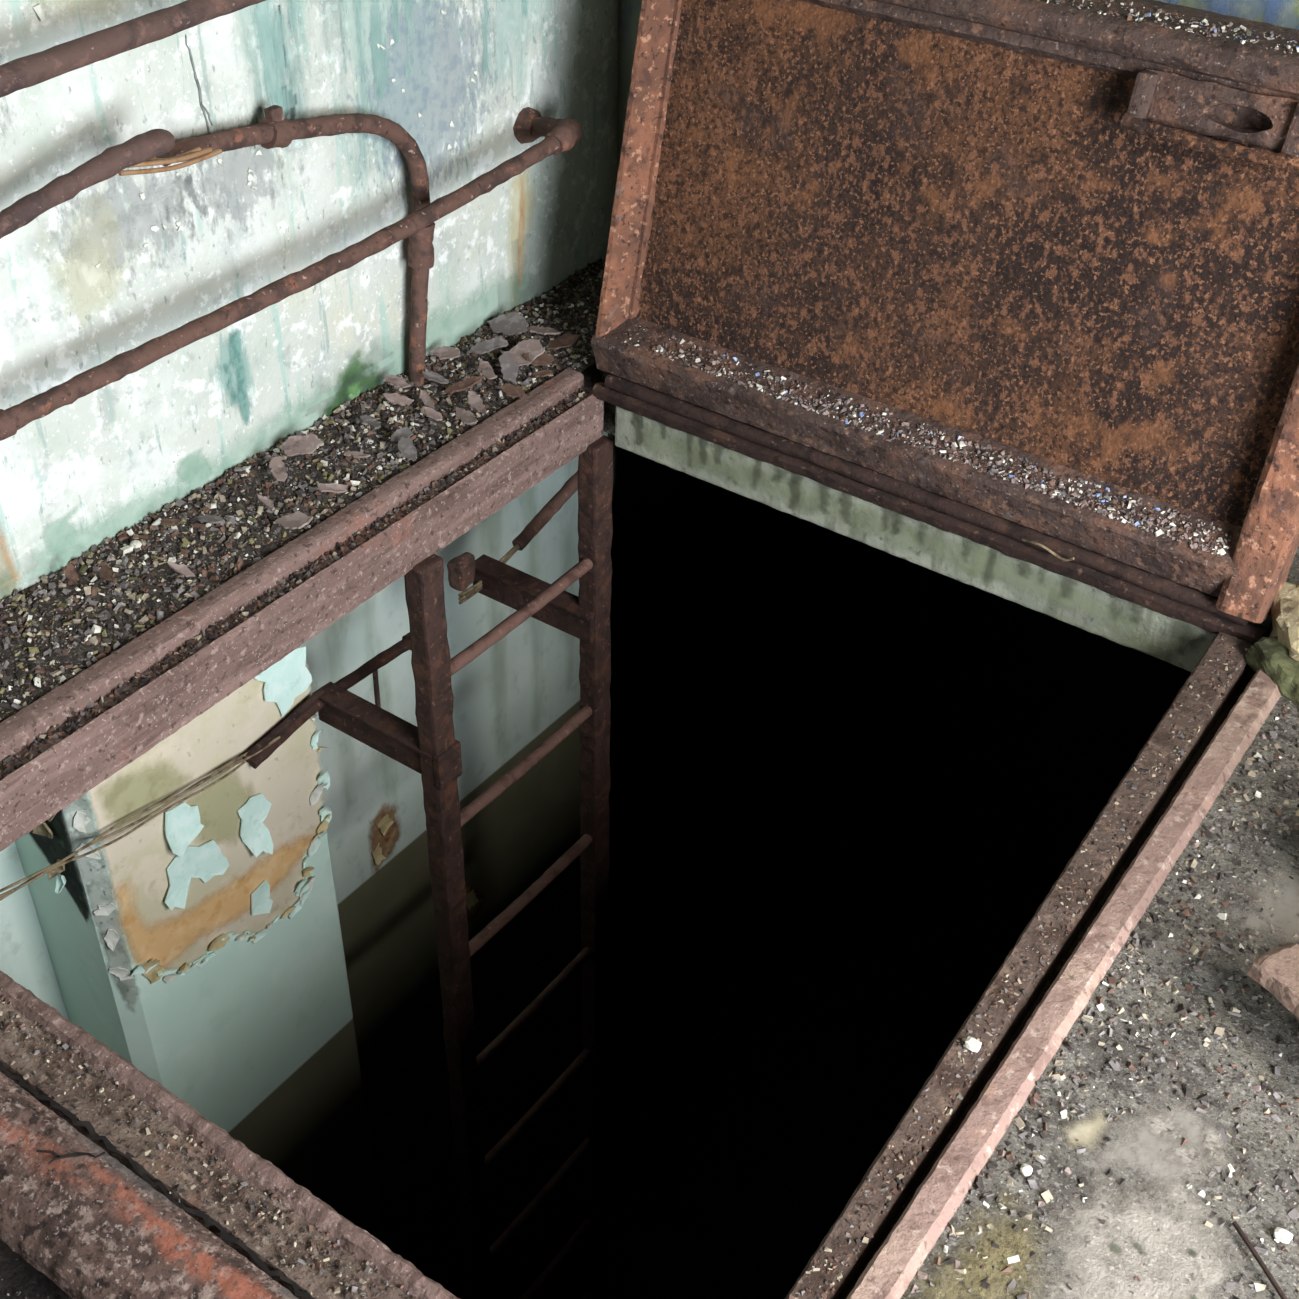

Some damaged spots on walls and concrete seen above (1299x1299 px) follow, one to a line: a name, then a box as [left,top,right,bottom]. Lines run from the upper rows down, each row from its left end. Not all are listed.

peeling [29,646,332,1011]
peeling [370,806,399,871]